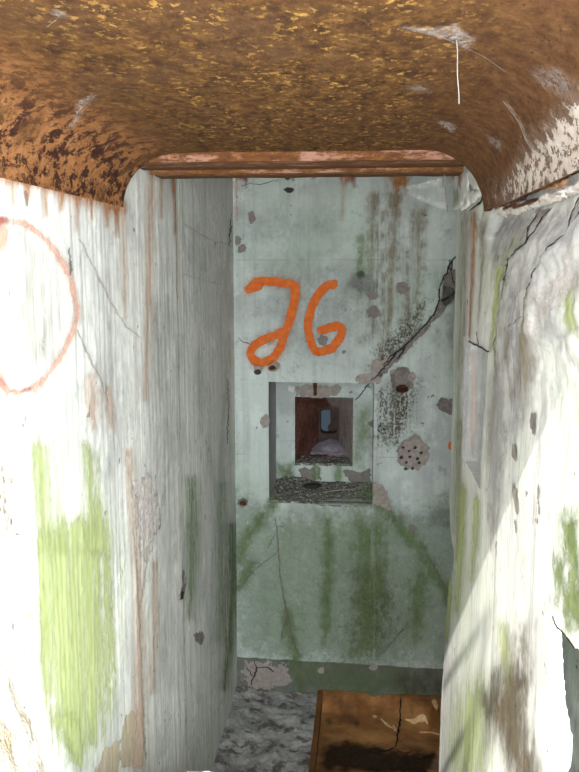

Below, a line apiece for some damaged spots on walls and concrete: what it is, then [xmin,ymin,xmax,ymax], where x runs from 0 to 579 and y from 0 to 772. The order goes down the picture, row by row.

corrosion [45,188,126,237]
corrosion [147,175,176,321]
crack [503,208,551,281]
crack [545,198,579,251]
spalling [352,260,456,393]
crack [355,256,456,401]
crack [468,268,536,368]
damp [32,442,61,551]
damp [83,444,110,554]
spalling [396,434,430,471]
damp [237,609,443,697]
damp [52,712,83,768]